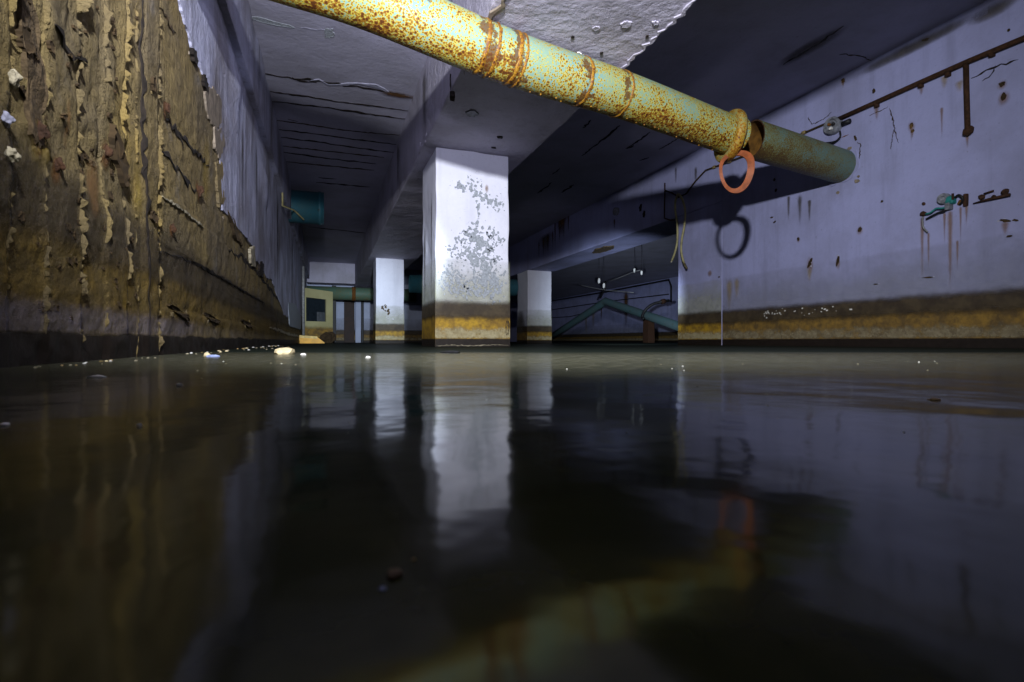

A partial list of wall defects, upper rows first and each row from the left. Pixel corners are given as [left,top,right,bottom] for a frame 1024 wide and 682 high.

spalling [621,0,696,69]
crack [971,60,1015,80]
spalling [0,0,302,357]
peeling [437,175,507,305]
leakage [0,150,1024,368]
rust [944,194,969,254]